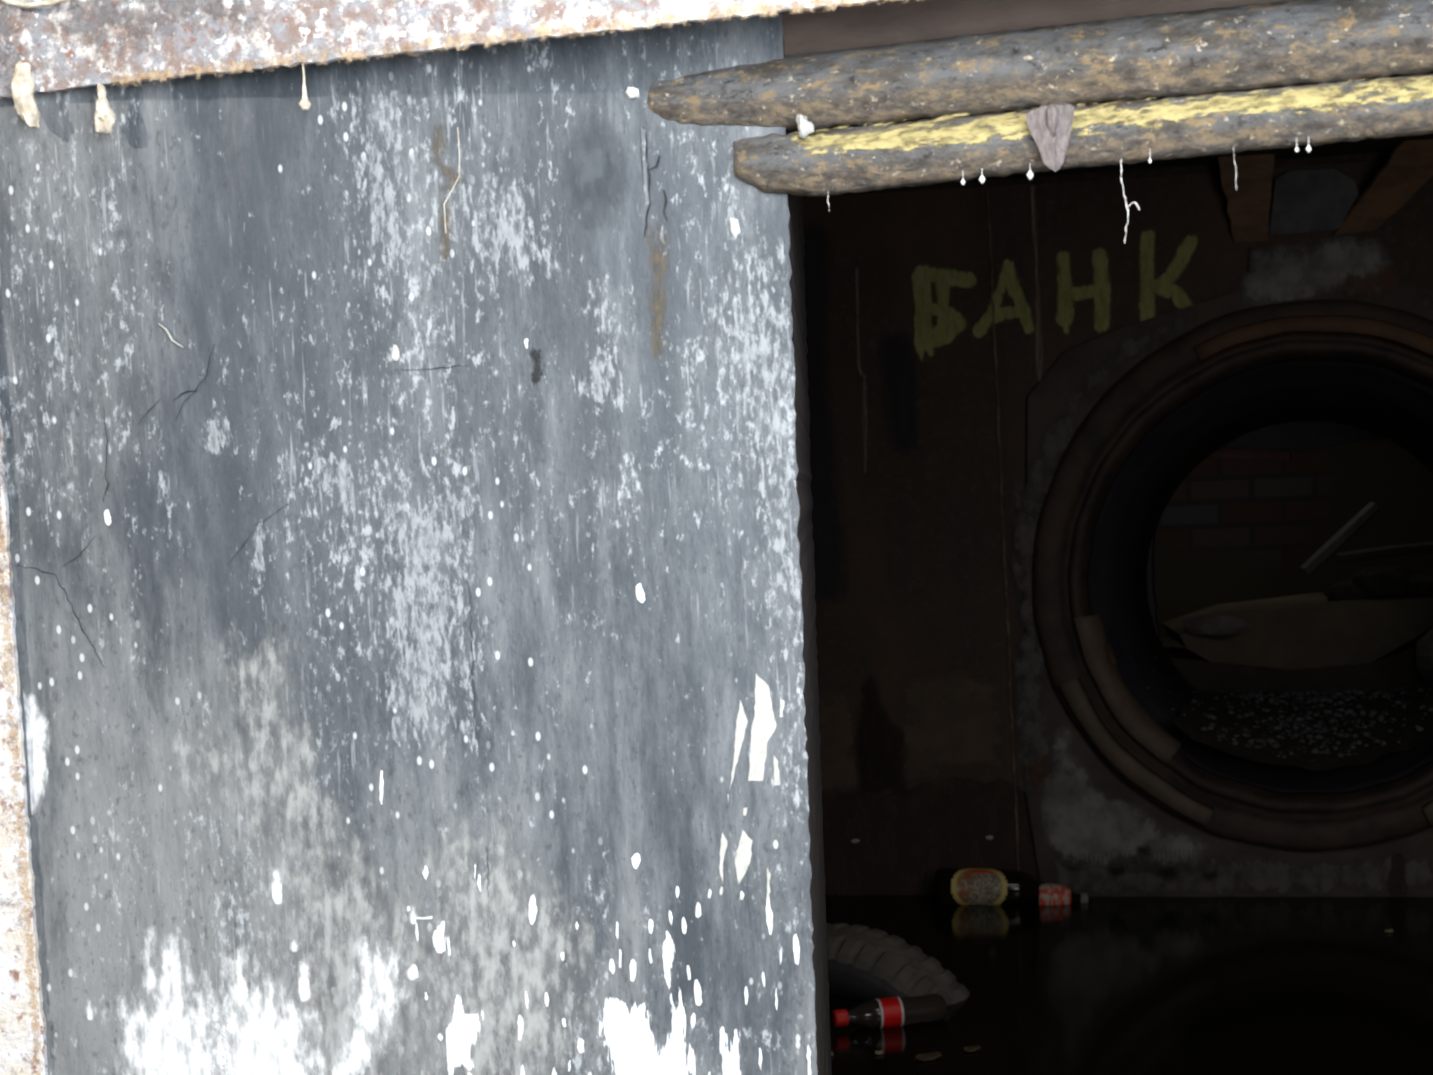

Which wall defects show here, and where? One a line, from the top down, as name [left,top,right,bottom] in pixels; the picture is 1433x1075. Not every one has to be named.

corrosion [54,0,254,55]
corrosion [119,51,364,84]
corrosion [383,0,863,52]
crack [103,344,215,502]
crack [17,536,105,668]
corrosion [2,593,20,781]
corrosion [15,804,40,1075]
peeling [118,932,428,1075]
peeling [407,906,451,956]
peeling [438,994,484,1075]
peeling [552,674,785,1075]
peeling [766,867,800,965]